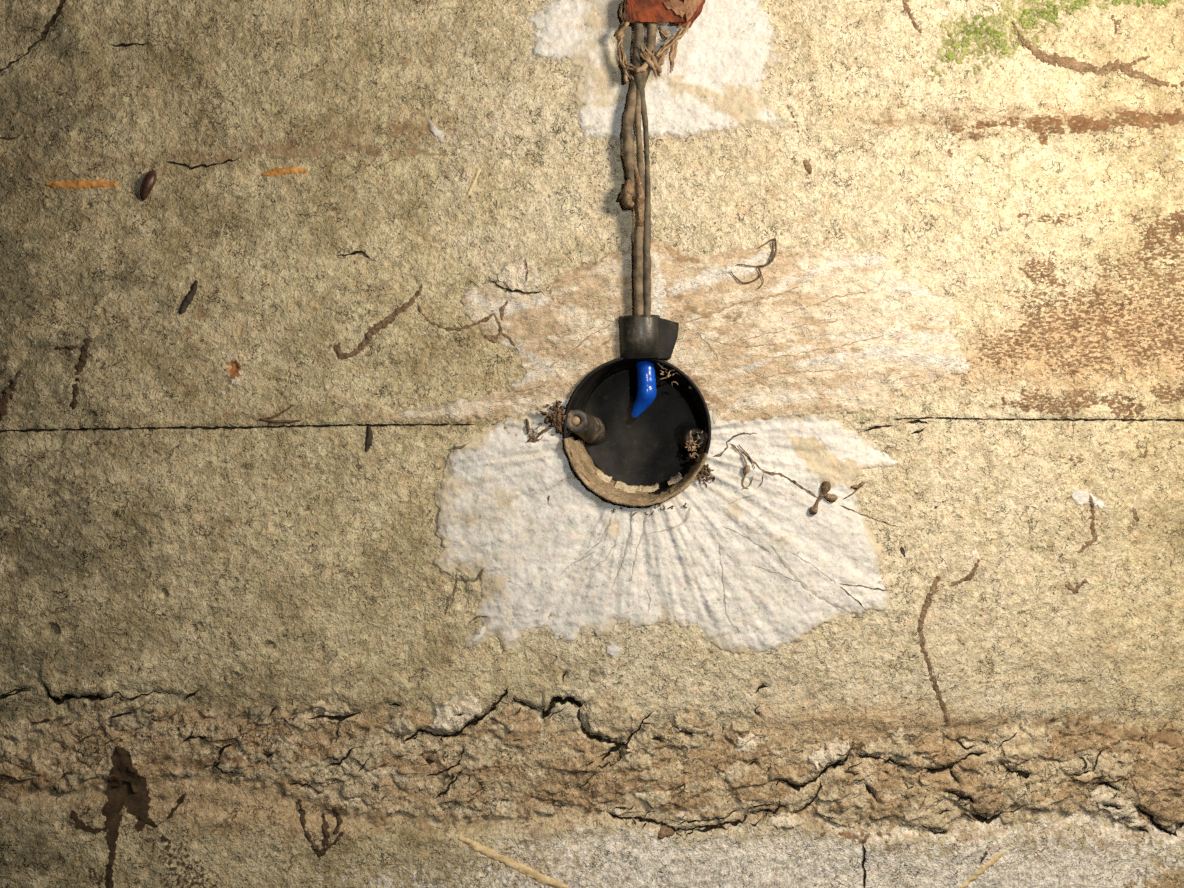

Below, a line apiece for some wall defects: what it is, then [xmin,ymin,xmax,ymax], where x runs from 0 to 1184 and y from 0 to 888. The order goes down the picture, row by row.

crack [0,0,66,72]
crack [0,423,473,432]
crack [866,417,1184,434]
crack [0,684,233,769]
leakage [70,739,217,888]
crack [290,712,370,787]
crack [389,672,724,799]
crack [608,732,1031,835]
crack [1065,749,1184,836]
crack [860,840,868,888]